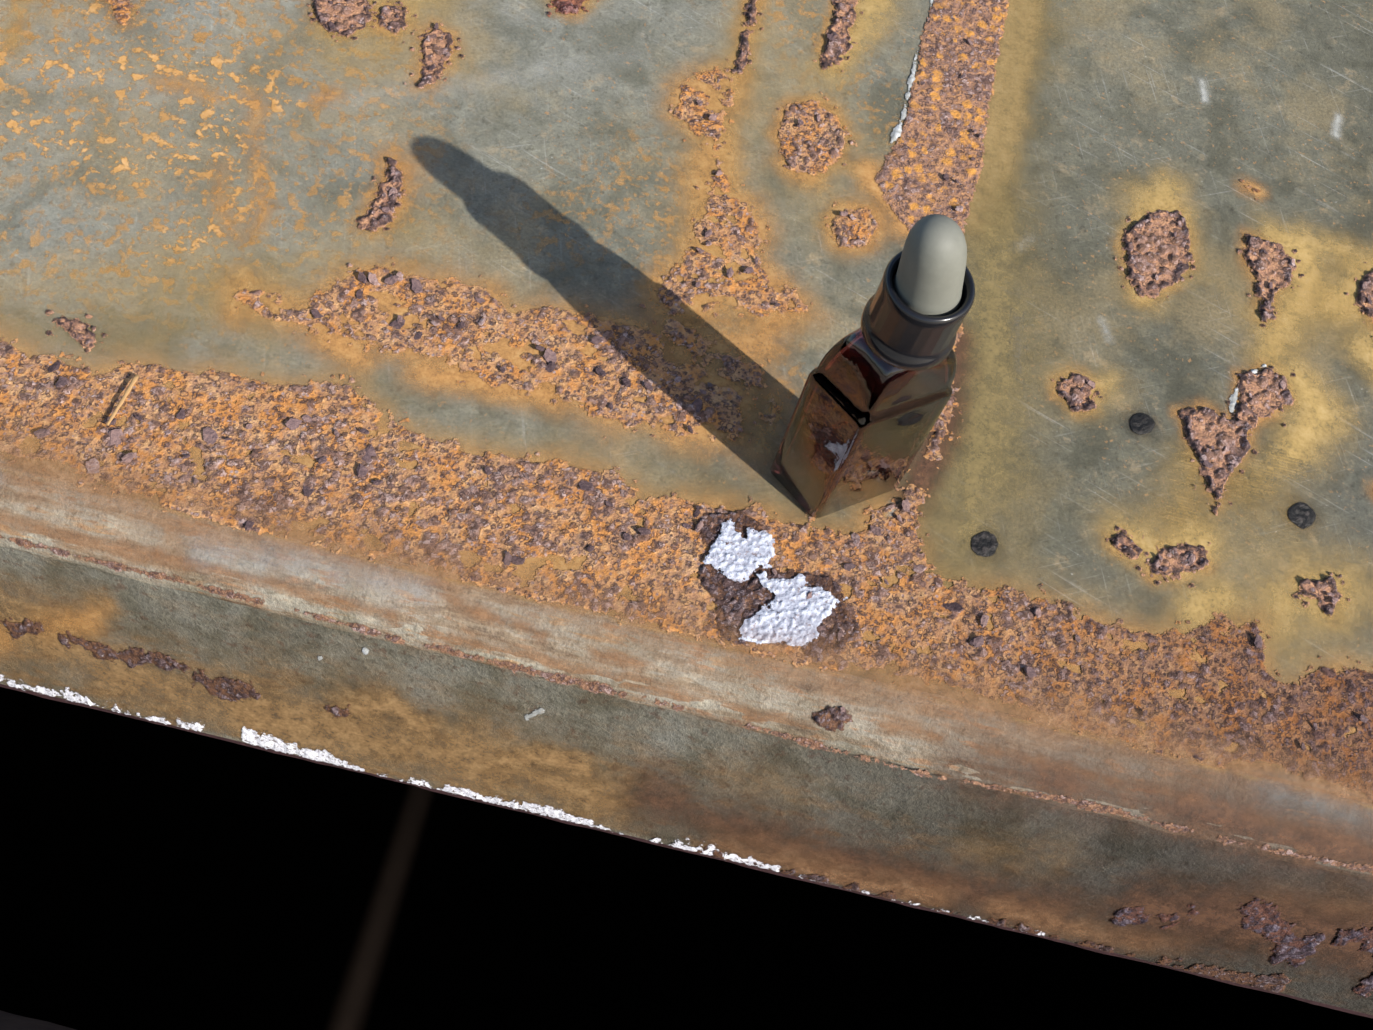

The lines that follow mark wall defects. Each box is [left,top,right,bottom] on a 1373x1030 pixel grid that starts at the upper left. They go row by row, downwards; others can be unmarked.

corrosion [0,0,1373,802]
corrosion [0,593,1373,998]